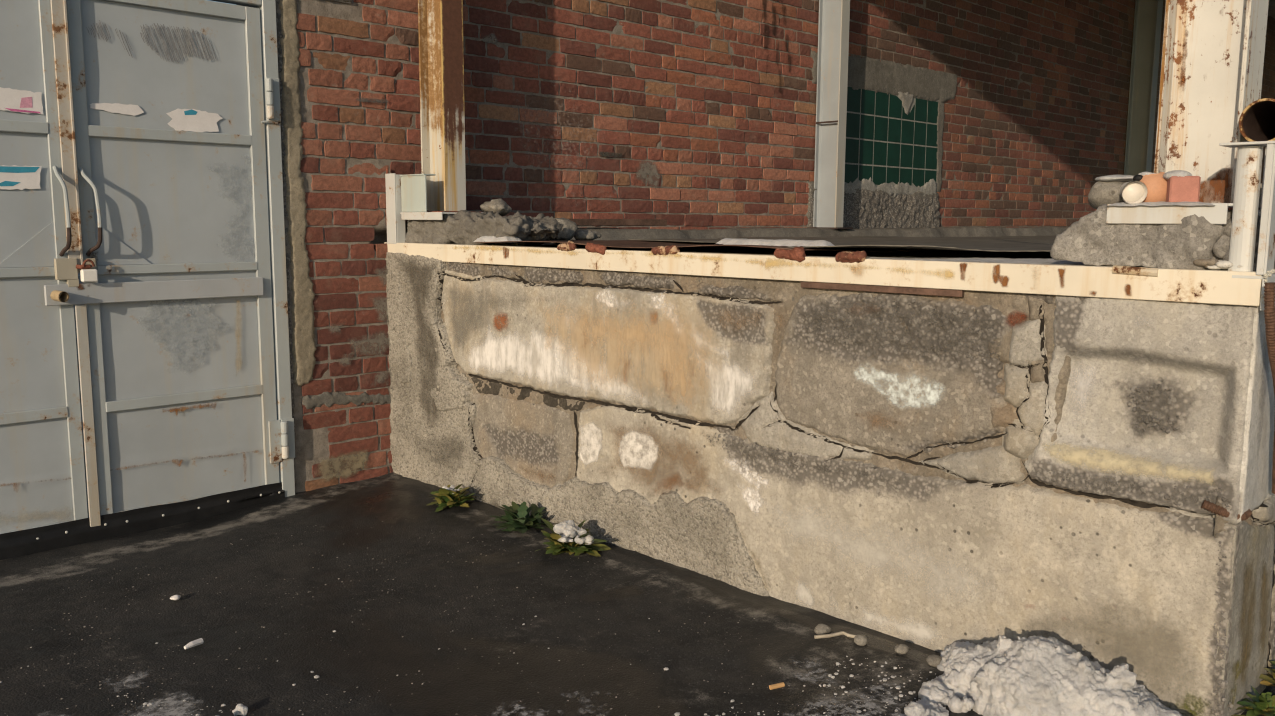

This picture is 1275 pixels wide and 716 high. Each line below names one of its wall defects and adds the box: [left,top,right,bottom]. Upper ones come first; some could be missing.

rust [1154,0,1169,173]
rust [1199,169,1232,203]
rust [938,263,967,279]
rust [993,265,1009,286]
peeling [385,252,770,596]